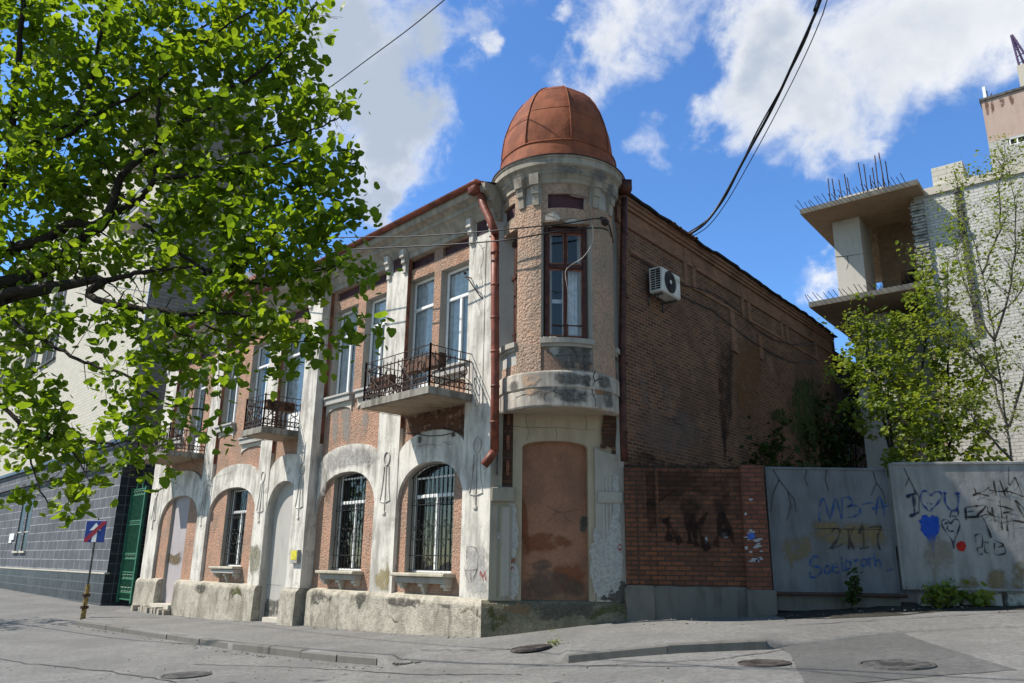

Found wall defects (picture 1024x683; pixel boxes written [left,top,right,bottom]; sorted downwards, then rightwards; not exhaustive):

crack [515,355,603,440]
damp [534,346,613,407]
flaking render [497,501,520,600]
flaking render [580,474,626,603]
damp [387,597,418,607]